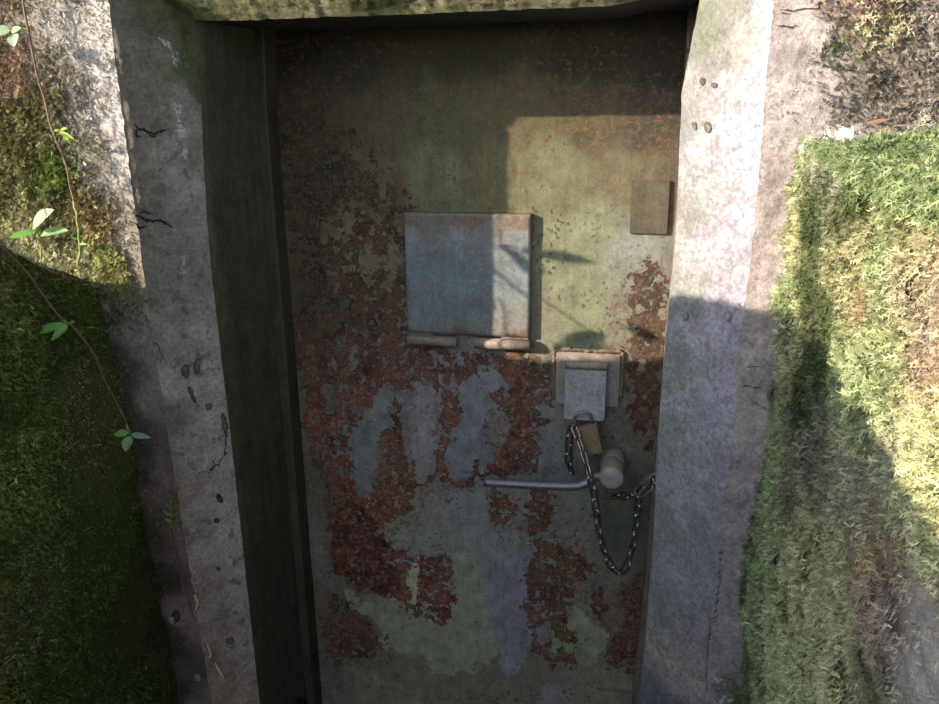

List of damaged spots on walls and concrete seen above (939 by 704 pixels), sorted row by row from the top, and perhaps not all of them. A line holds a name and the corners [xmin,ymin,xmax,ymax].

crack [134,124,168,138]
crack [133,210,173,230]
peeling [345,365,505,499]
rust [279,106,600,671]
rust [622,257,670,452]
peeling [344,549,528,679]
peeling [551,607,610,666]
rust [589,571,644,675]